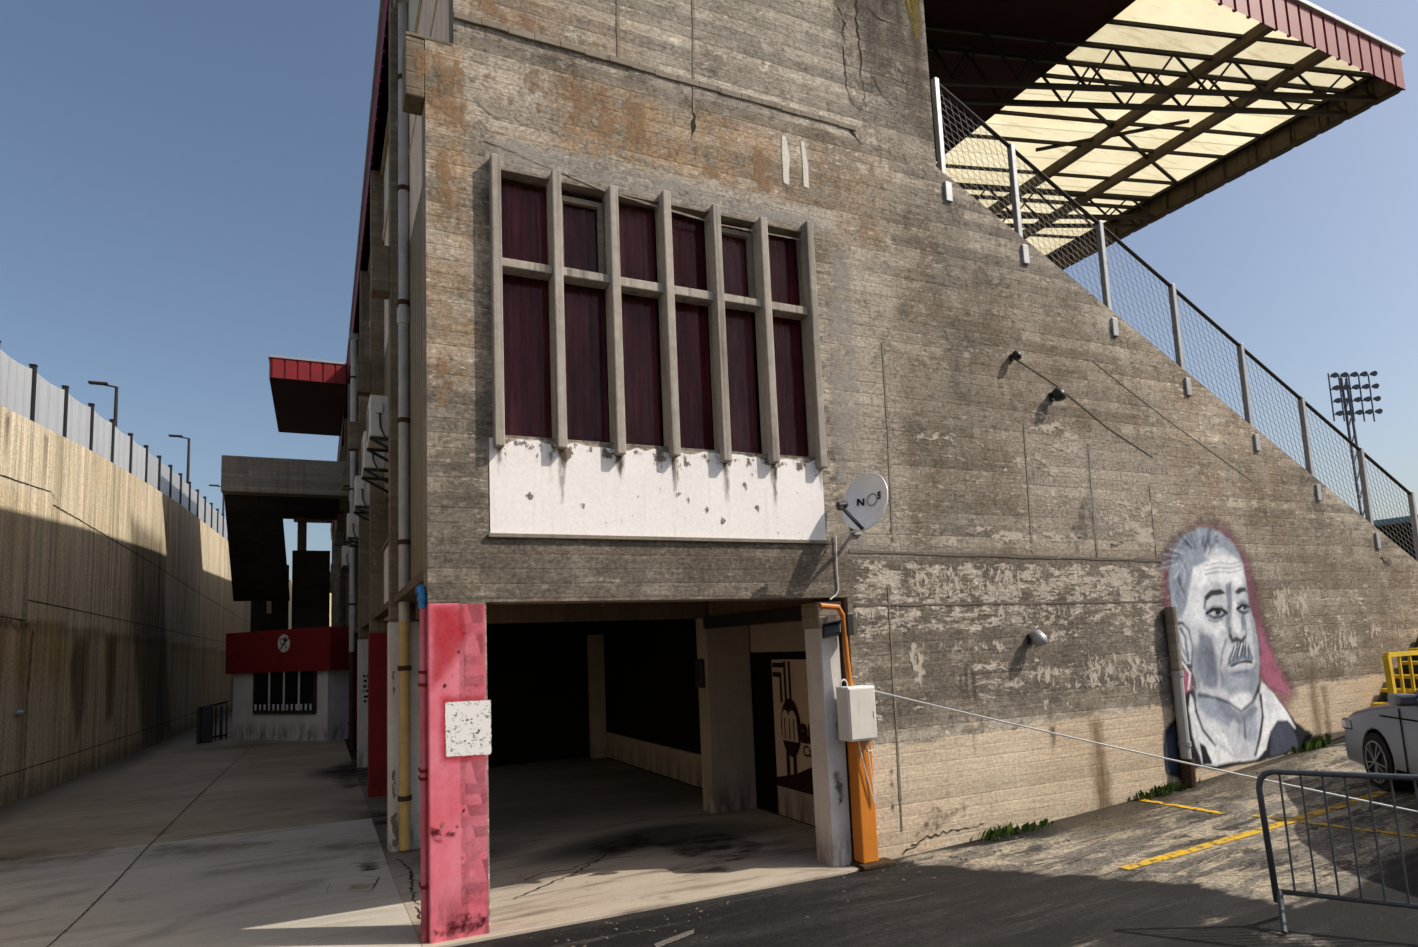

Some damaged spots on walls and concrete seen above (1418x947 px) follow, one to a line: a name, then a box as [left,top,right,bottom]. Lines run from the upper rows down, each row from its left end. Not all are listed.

crack [835,0,897,143]
peeling [505,438,817,489]
peeling [901,428,984,447]
peeling [1025,408,1085,477]
peeling [889,505,1083,551]
peeling [1102,492,1162,553]
peeling [899,564,1165,710]